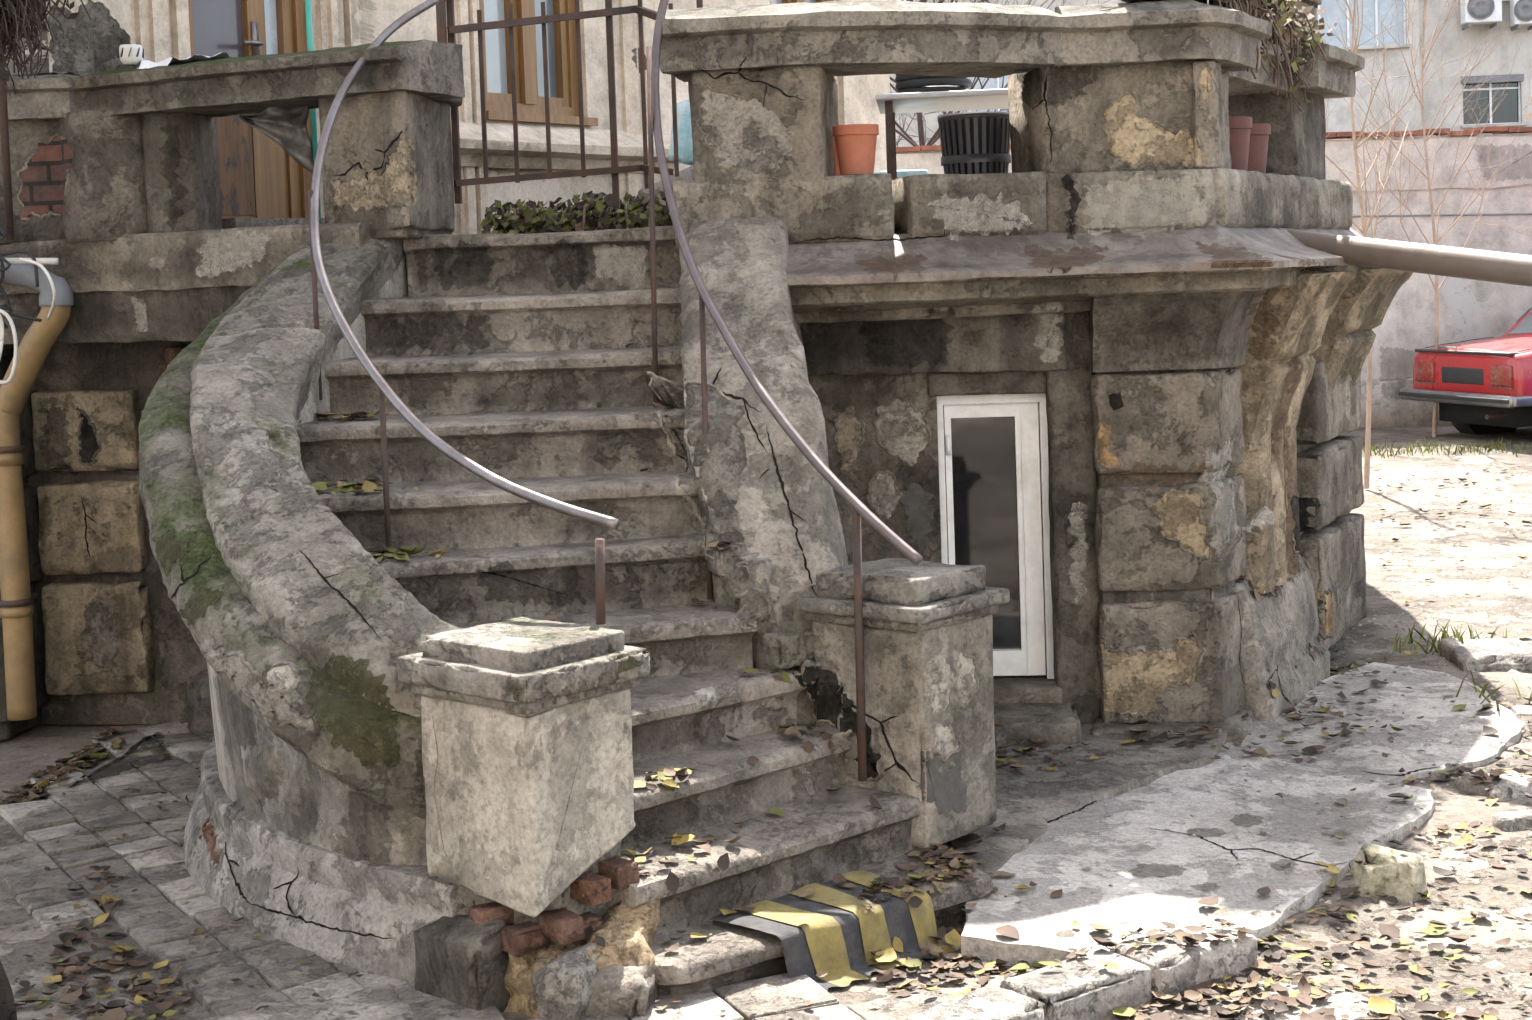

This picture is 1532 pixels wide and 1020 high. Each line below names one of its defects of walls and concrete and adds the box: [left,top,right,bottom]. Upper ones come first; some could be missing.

peeling [17,153,70,222]
crack [336,127,408,180]
peeling [696,84,795,178]
spalling [1102,91,1208,170]
crack [684,367,817,595]
spalling [1153,488,1213,560]
crack [298,548,380,638]
spalling [1094,632,1206,718]
spalling [792,661,885,784]
crack [840,701,919,784]
crack [224,842,395,939]